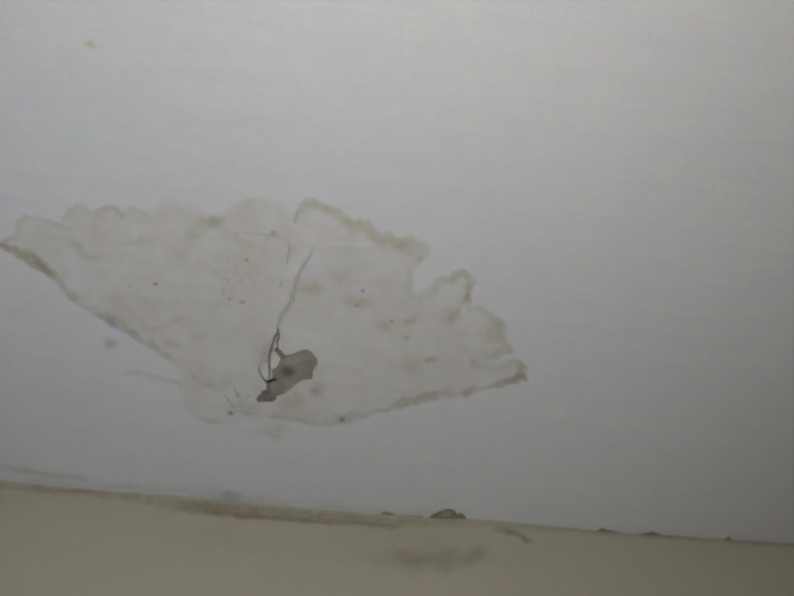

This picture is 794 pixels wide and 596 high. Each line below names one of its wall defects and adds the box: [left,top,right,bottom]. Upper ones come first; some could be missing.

water stain [0,194,530,443]
crack [223,243,312,423]
spalling [257,335,317,402]
water stain [0,463,185,495]
water stain [201,502,563,580]